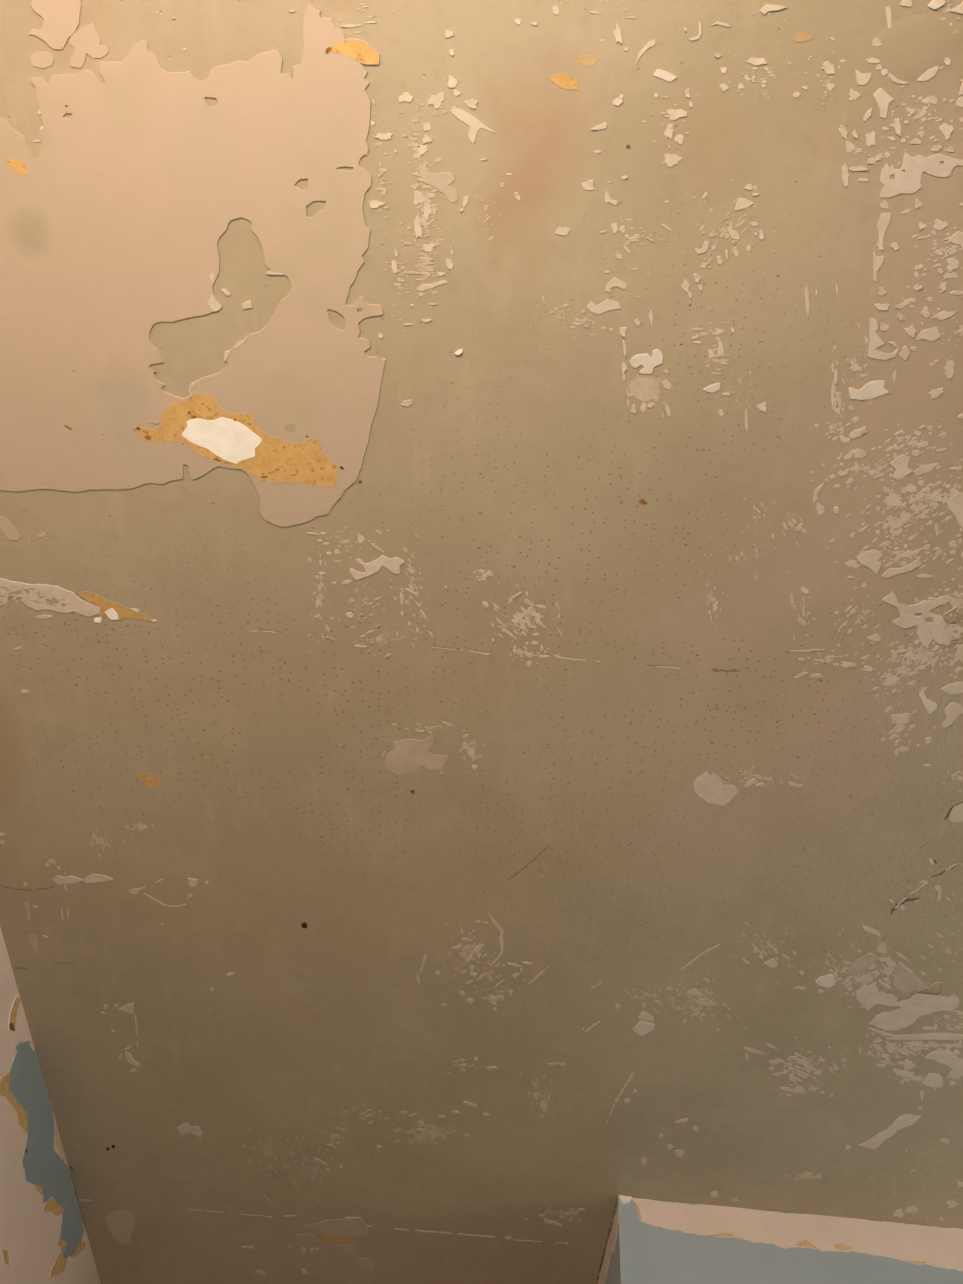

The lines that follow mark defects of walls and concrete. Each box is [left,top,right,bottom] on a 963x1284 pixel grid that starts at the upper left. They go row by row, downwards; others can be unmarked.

peeling [899,0,963,33]
peeling [642,69,699,174]
peeling [681,179,775,298]
peeling [0,0,515,658]
peeling [530,218,679,418]
peeling [788,37,963,757]
peeling [482,585,563,667]
crack [944,802,963,822]
crack [889,858,963,914]
peeling [729,893,963,1149]
peeling [0,1041,94,1278]
peeling [598,1179,963,1284]